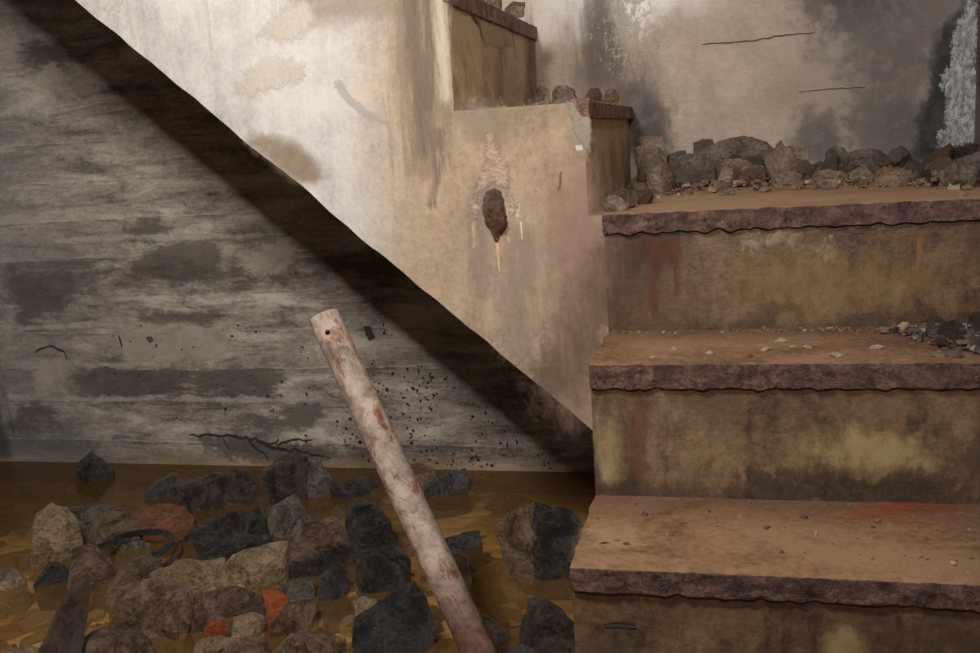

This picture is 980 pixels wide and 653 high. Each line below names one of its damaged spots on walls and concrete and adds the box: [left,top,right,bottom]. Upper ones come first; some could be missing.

crack [702,32,814,45]
water stain [833,0,980,160]
spalling [469,131,521,247]
water stain [6,266,75,326]
water stain [123,217,224,325]
crack [190,433,330,460]